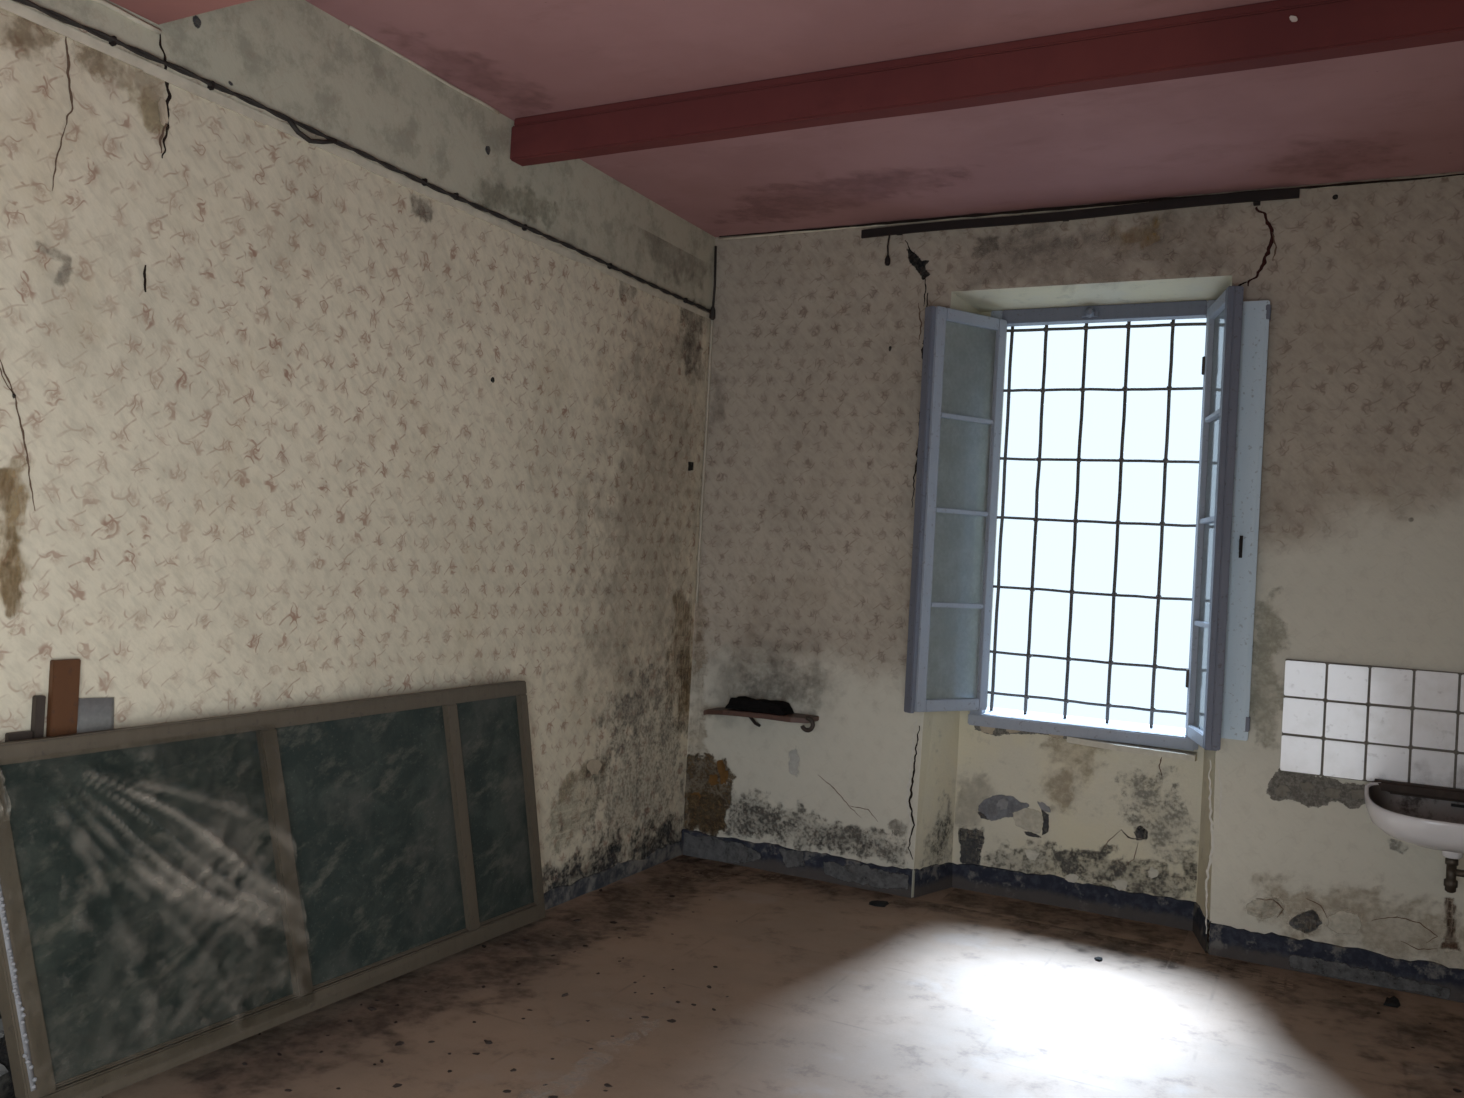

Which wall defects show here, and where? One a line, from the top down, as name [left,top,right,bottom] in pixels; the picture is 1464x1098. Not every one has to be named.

crack [52,36,73,191]
crack [719,173,1464,286]
crack [0,360,35,511]
leakage [543,813,682,890]
leakage [726,790,907,864]
crack [818,719,920,859]
spalling [978,795,1051,838]
leakage [958,828,1197,900]
spalling [1267,768,1365,809]